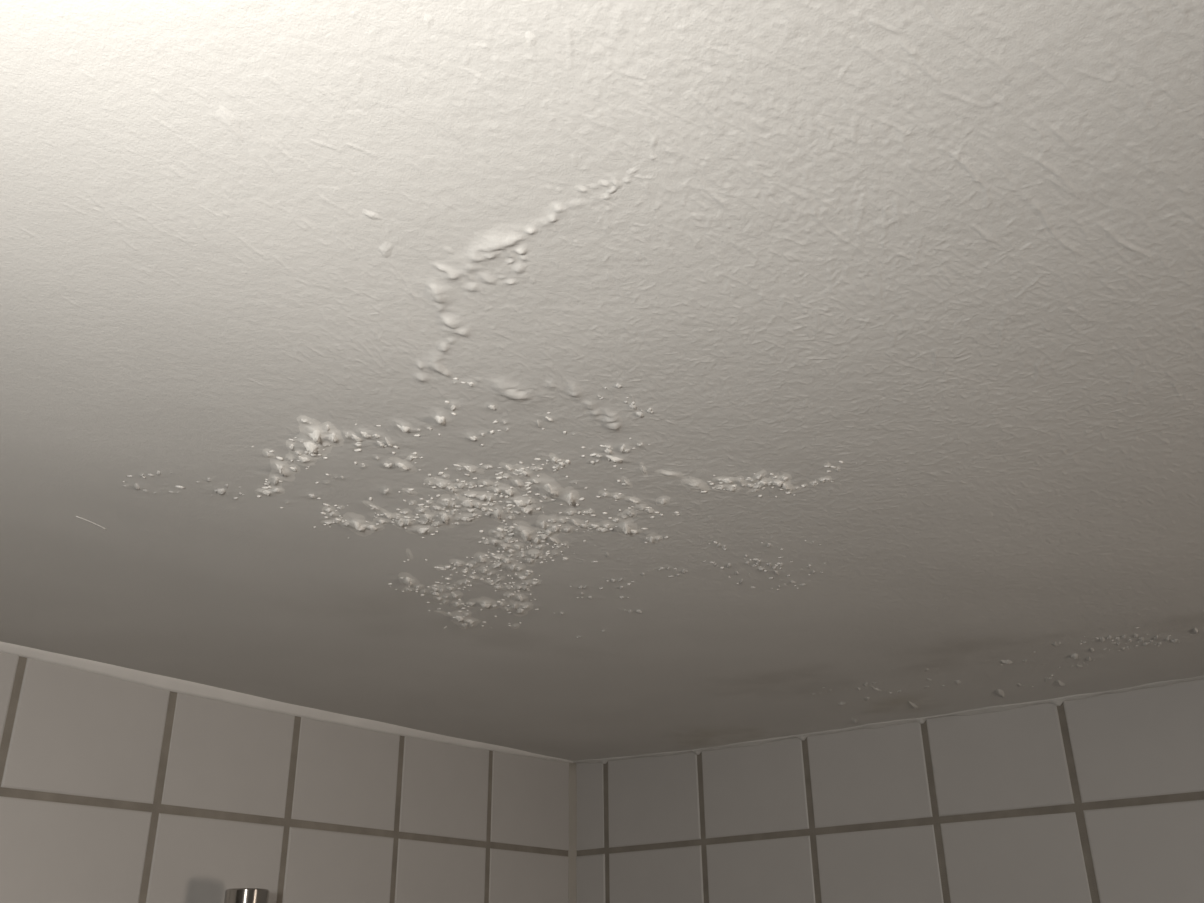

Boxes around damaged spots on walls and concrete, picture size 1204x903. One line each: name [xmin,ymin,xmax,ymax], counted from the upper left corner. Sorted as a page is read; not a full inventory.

peeling [123,371,844,629]